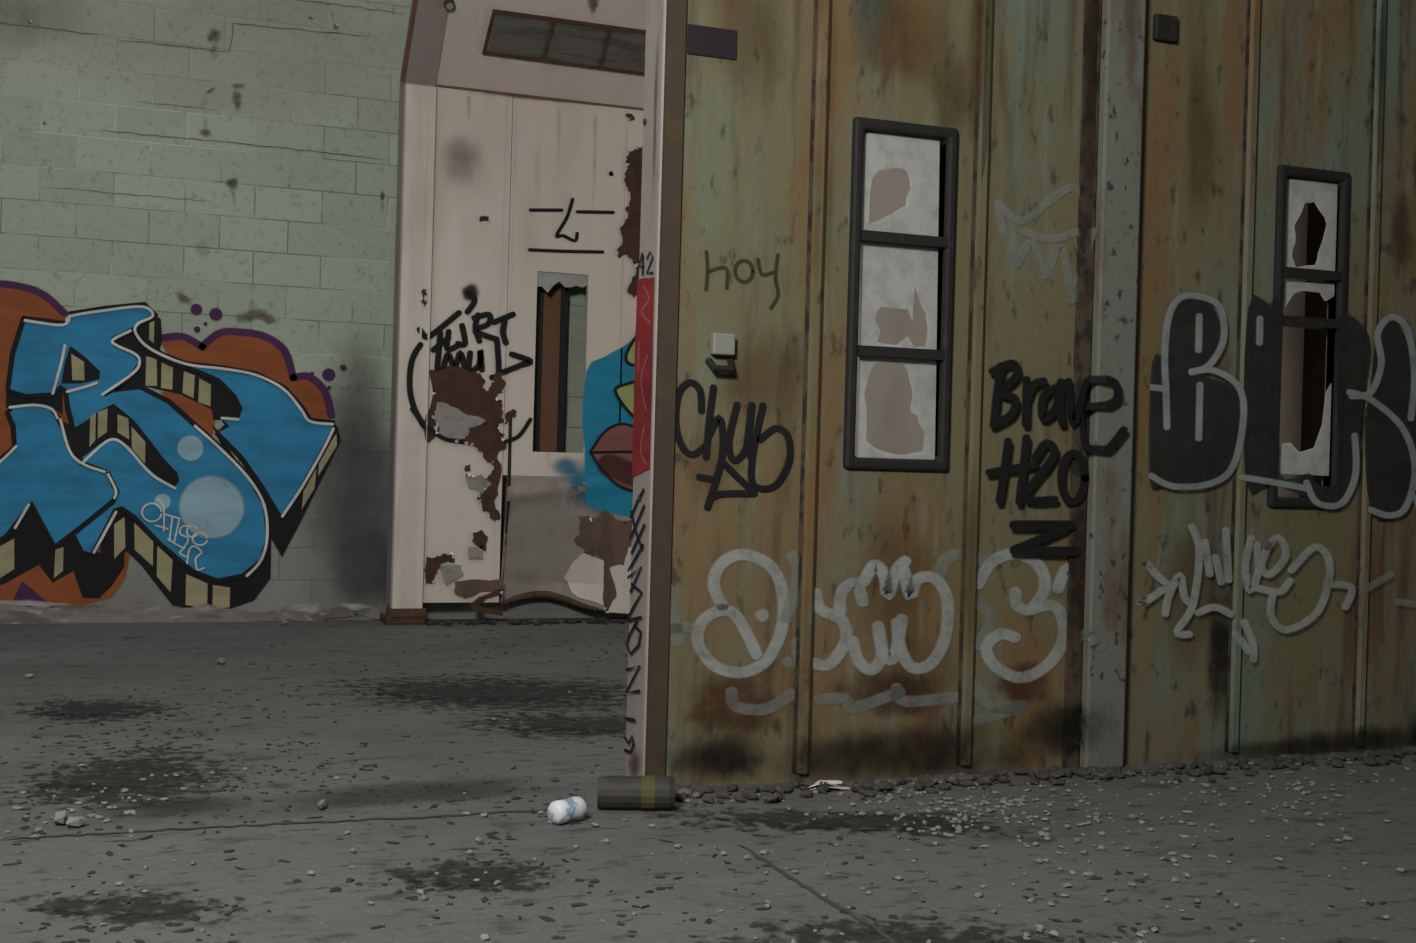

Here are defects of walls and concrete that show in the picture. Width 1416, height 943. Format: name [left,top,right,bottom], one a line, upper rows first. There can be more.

peeling [609,147,643,297]
peeling [424,365,517,616]
peeling [564,509,632,614]